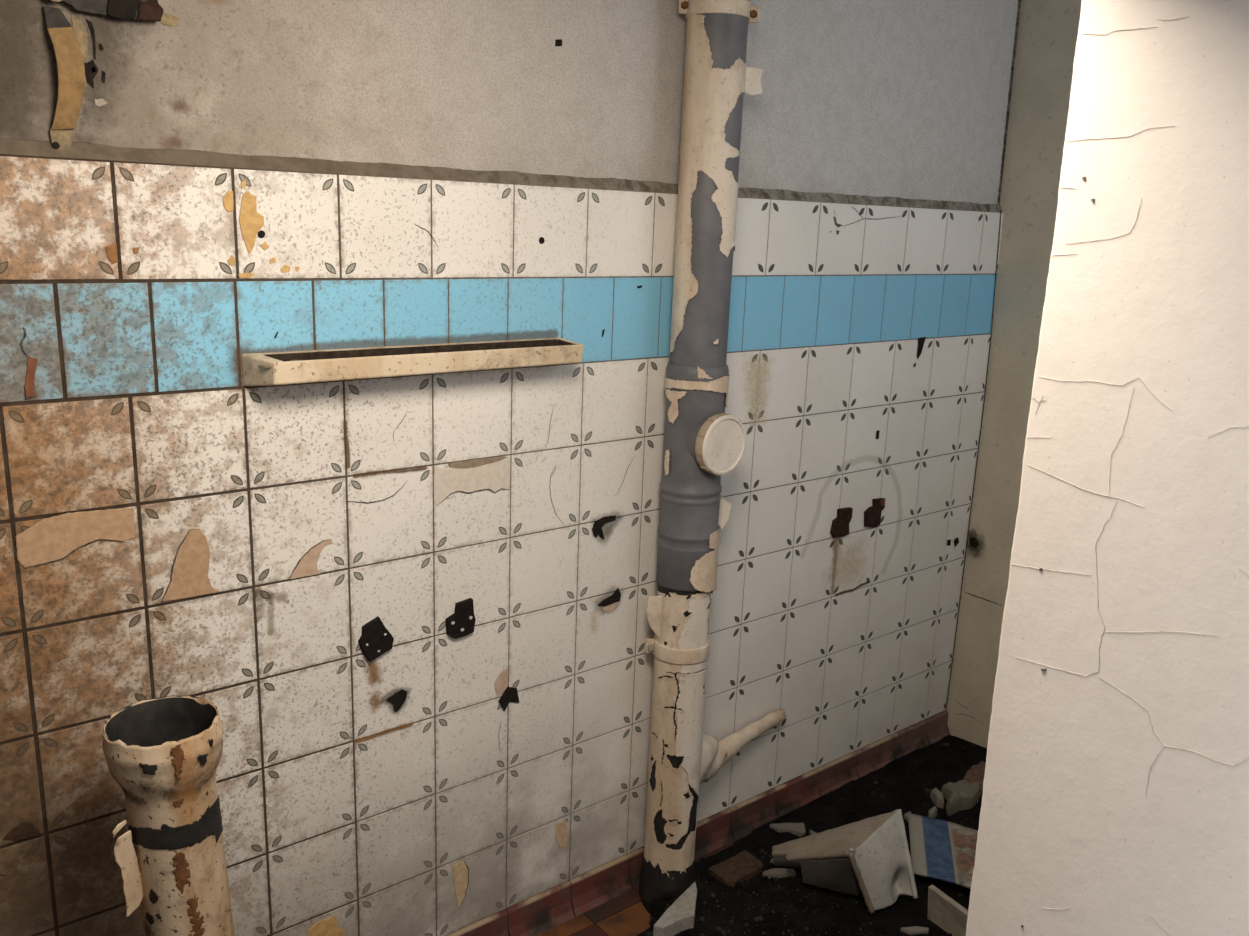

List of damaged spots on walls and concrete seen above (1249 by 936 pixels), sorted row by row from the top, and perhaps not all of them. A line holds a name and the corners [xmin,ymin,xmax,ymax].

crack [1092,16,1188,35]
flaking render [71,15,108,107]
crack [1072,126,1168,141]
spalling [223,179,300,278]
crack [1049,198,1142,256]
leakage [236,351,247,385]
spalling [16,507,135,568]
spalling [161,528,219,602]
spalling [289,539,333,579]
spalling [592,515,616,539]
crack [1011,376,1248,796]
spalling [494,668,519,711]